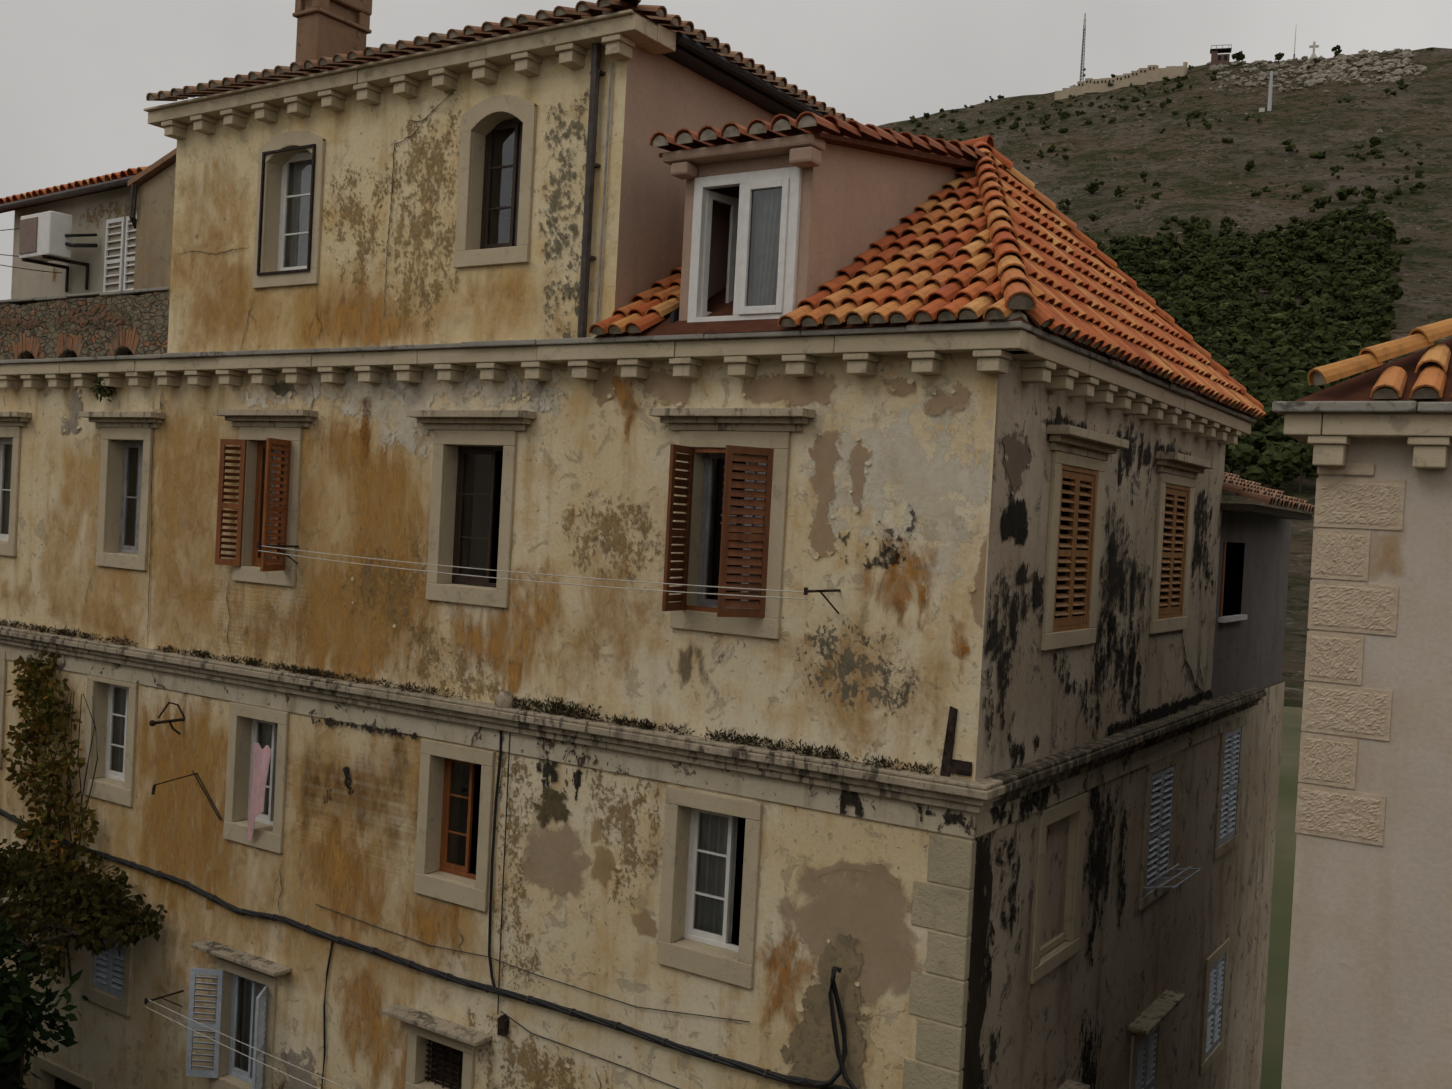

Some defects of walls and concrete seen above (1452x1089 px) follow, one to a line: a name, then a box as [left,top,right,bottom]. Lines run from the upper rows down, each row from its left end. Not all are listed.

peeling [562,487,665,580]
peeling [741,369,836,407]
peeling [808,430,872,559]
mould [983,498,1045,768]
water stain [1047,407,1095,443]
mould [1052,424,1191,740]
mould [1190,482,1216,603]
peeling [494,752,544,989]
peeling [588,769,661,911]
mould [1082,782,1130,968]
spalling [780,933,872,1089]
water stain [1071,1007,1104,1089]